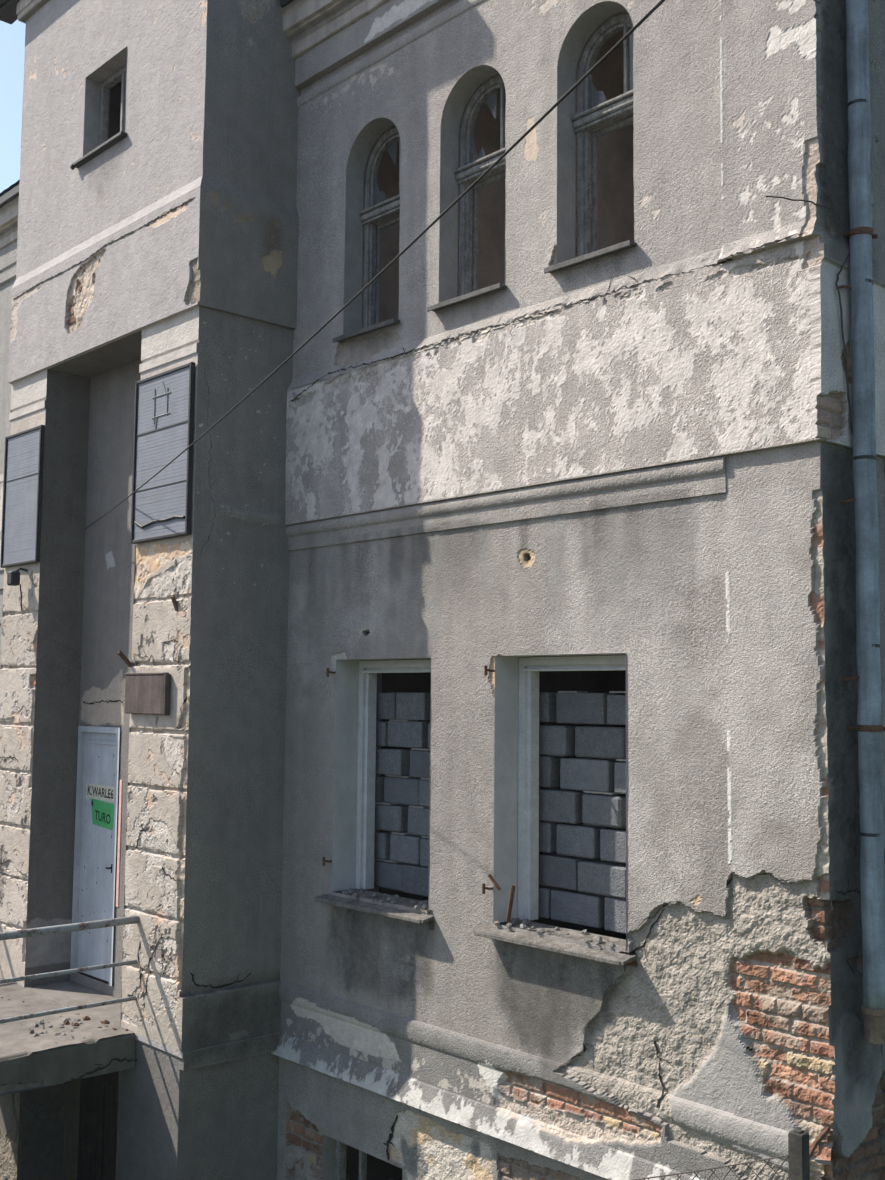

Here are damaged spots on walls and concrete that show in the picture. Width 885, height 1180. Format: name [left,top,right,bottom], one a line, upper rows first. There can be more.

peeling [365,0,432,42]
peeling [766,0,846,60]
crack [291,232,806,401]
peeling [286,39,849,520]
spalling [810,491,856,696]
peeling [0,846,72,967]
crack [128,935,251,1001]
damp [501,951,569,1055]
spalling [271,681,885,1180]
crack [557,900,678,1068]
crack [725,873,806,918]
crack [654,1041,674,1108]